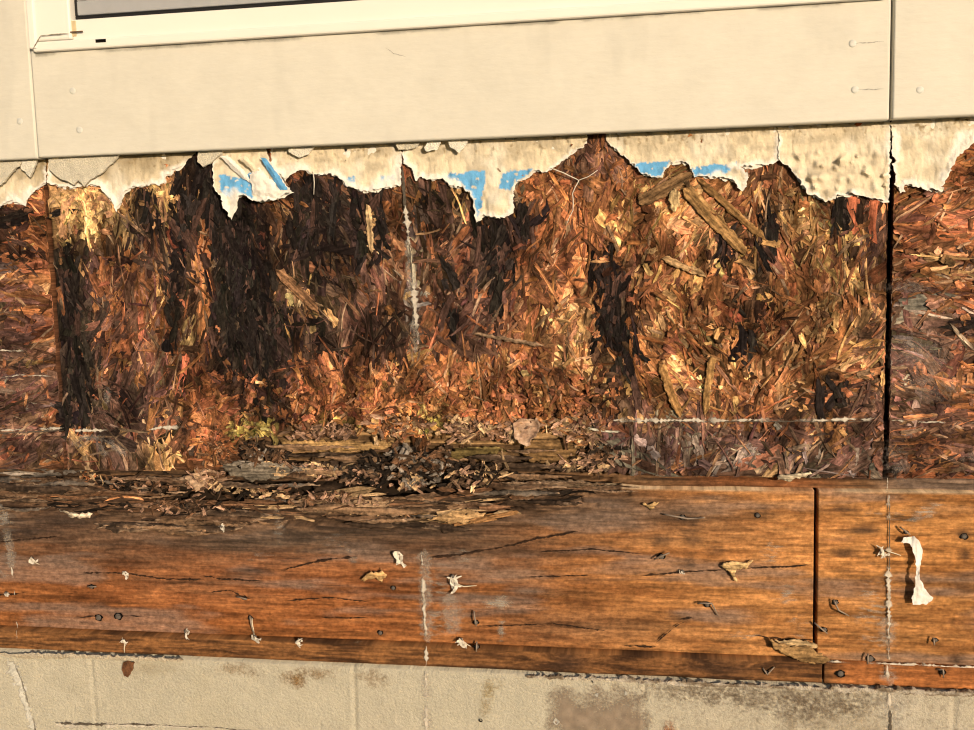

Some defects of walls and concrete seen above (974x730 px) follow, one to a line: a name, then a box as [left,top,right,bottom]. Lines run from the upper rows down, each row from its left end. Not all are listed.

flaking render [0,155,120,187]
flaking render [197,150,224,168]
flaking render [288,146,315,158]
flaking render [395,139,468,153]
leakage [54,242,102,442]
leakage [136,158,288,425]
leakage [285,172,392,276]
leakage [470,198,550,319]
leakage [587,234,651,410]
leakage [712,221,738,276]
leakage [754,200,780,276]
leakage [830,194,854,238]